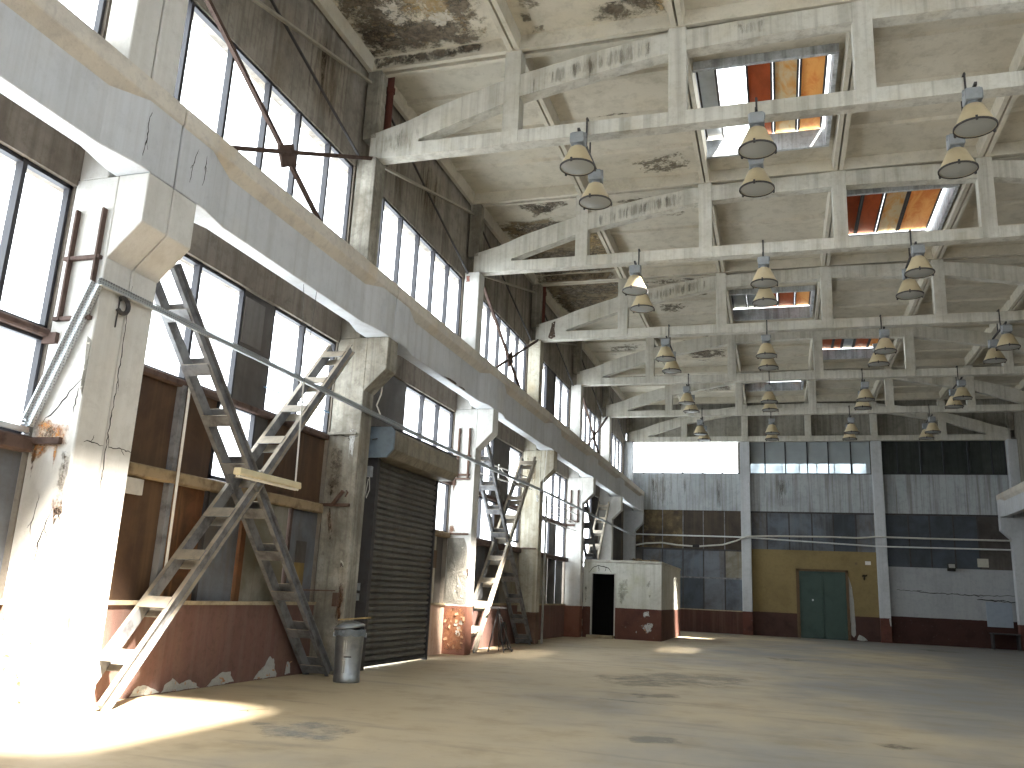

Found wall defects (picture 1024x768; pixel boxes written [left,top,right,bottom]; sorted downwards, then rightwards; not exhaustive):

mould [594,0,664,20]
mould [338,0,485,69]
leakage [634,153,688,172]
leakage [501,201,567,240]
leakage [527,240,575,260]
leakage [590,233,607,255]
crack [84,286,133,546]
rust [30,420,64,477]
flaking render [443,538,470,652]
crack [897,589,1016,603]
peeling [254,656,292,679]
peeling [129,672,234,697]